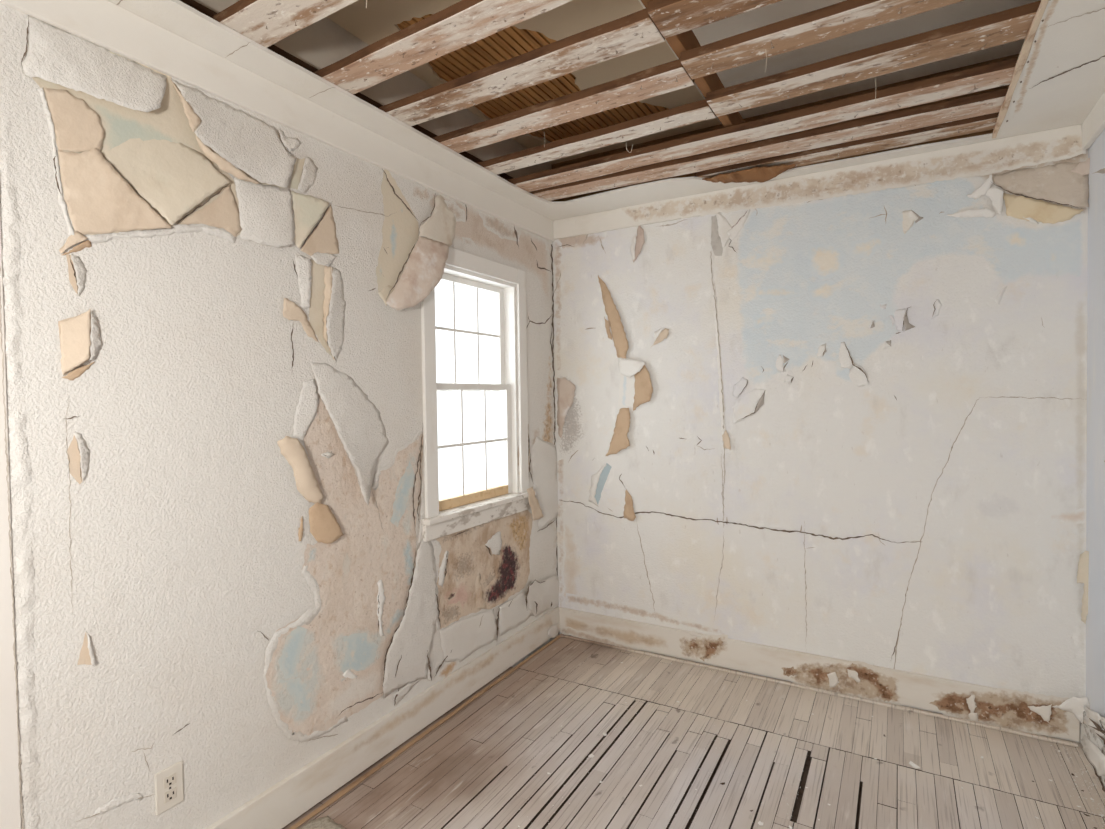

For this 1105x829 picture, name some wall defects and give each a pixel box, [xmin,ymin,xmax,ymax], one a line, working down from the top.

crack [1032,56,1105,88]
damp [410,183,727,654]
crack [556,259,1078,669]
peeling [733,149,1090,423]
peeling [377,580,385,636]
spalling [926,688,1105,792]